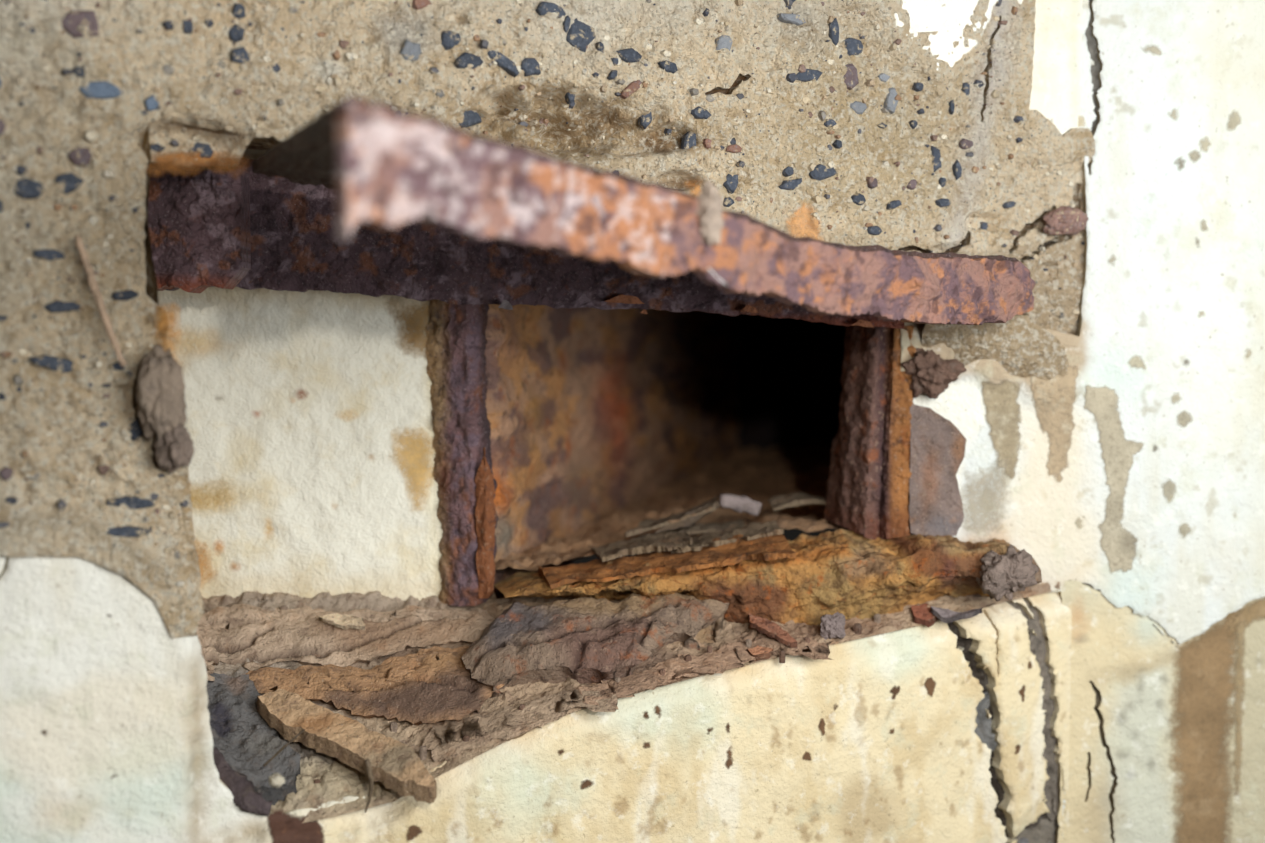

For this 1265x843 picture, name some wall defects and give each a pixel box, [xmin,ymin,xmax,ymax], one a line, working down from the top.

crack [1085,0,1101,169]
rust [155,152,244,174]
rust [788,206,819,239]
spalling [0,0,1095,638]
rust [605,294,647,314]
rust [851,319,874,328]
peeling [965,366,1157,572]
crack [0,557,9,578]
spalling [925,678,936,696]
crack [947,598,1116,839]
leakage [1171,599,1265,843]
peeling [213,747,273,816]